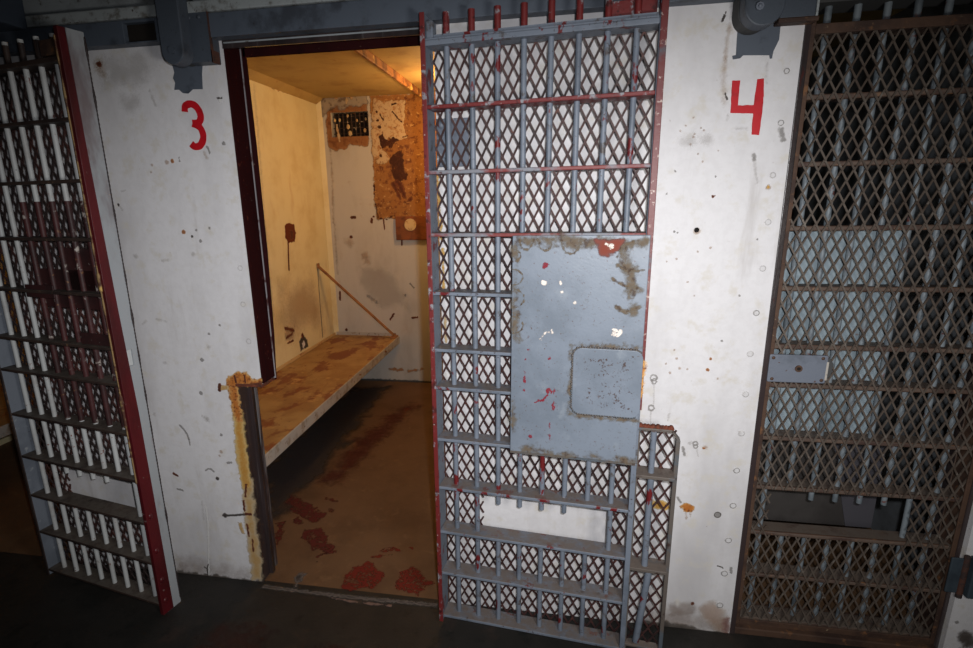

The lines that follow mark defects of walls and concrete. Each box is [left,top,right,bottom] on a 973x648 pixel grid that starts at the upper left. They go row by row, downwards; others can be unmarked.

flaking render [321,93,438,220]
rust [285,223,296,271]
rust [218,371,263,581]
rust [652,497,694,512]